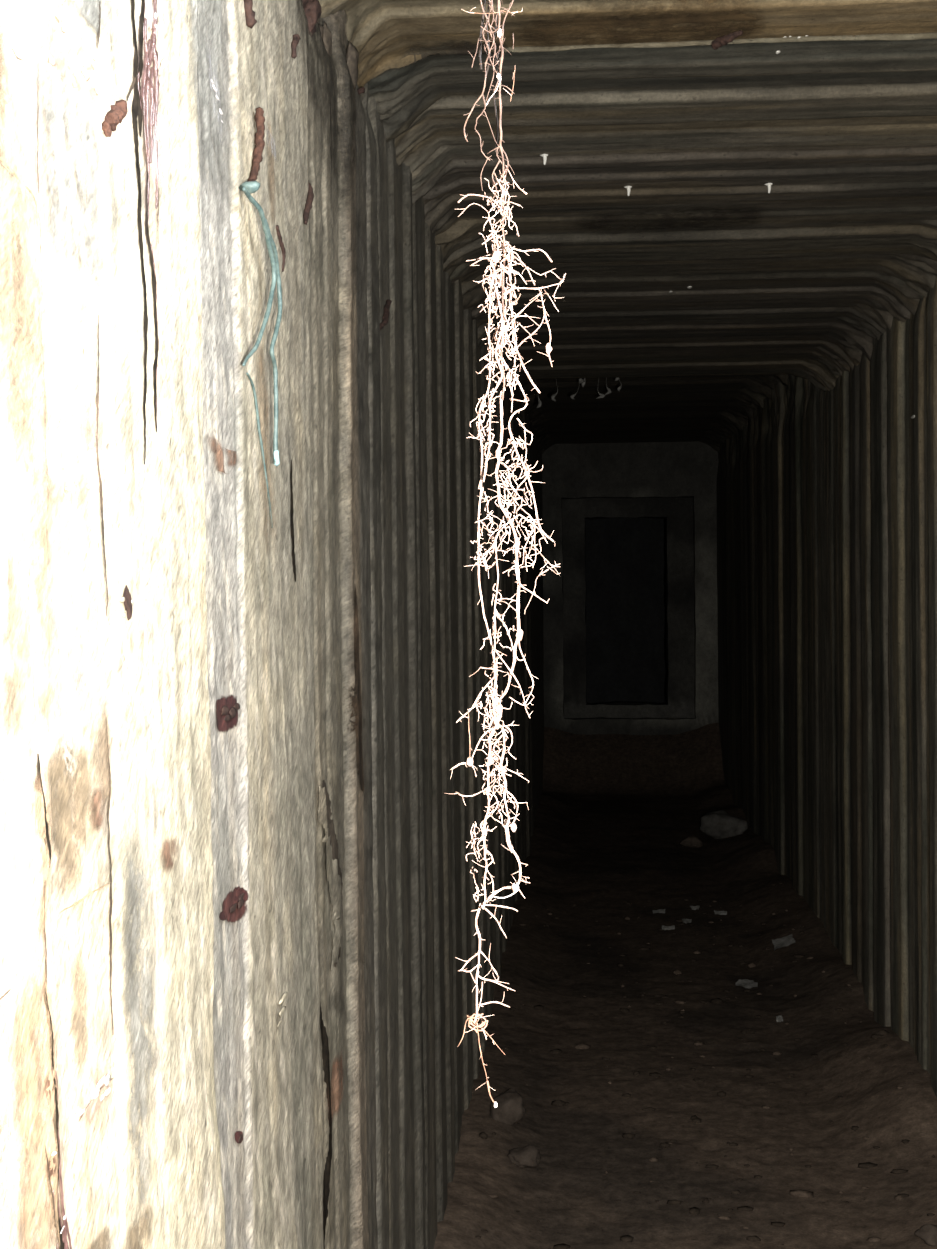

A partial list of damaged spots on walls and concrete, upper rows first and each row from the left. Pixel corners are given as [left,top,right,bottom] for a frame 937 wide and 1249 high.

crack [95,0,103,47]
corrosion [101,105,126,137]
crack [127,0,160,465]
crack [96,315,108,616]
corrosion [211,438,237,473]
crack [289,460,297,582]
corrosion [216,695,240,732]
corrosion [219,887,249,923]
crack [0,718,114,1249]
crack [320,1004,343,1249]